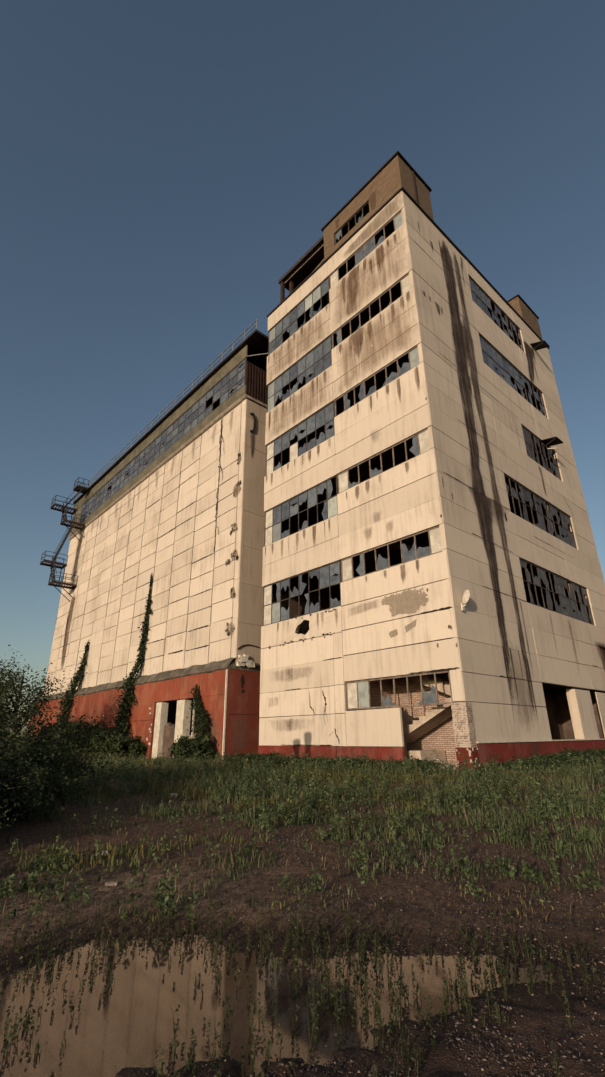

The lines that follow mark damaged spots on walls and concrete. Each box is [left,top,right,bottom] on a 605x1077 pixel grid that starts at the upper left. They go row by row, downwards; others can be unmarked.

damp [358,234,396,295]
damp [339,292,410,382]
damp [269,372,326,433]
damp [423,241,537,713]
peeling [381,588,428,638]
crack [291,688,340,746]